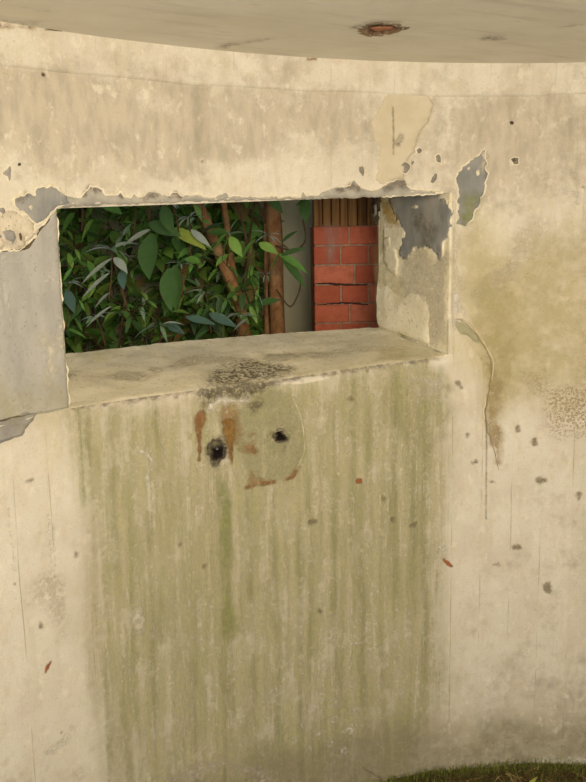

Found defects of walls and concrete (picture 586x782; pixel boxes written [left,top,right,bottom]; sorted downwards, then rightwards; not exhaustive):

peeling [0,147,489,444]
corrosion [195,411,206,462]
corrosion [221,407,256,460]
crack [454,318,500,470]